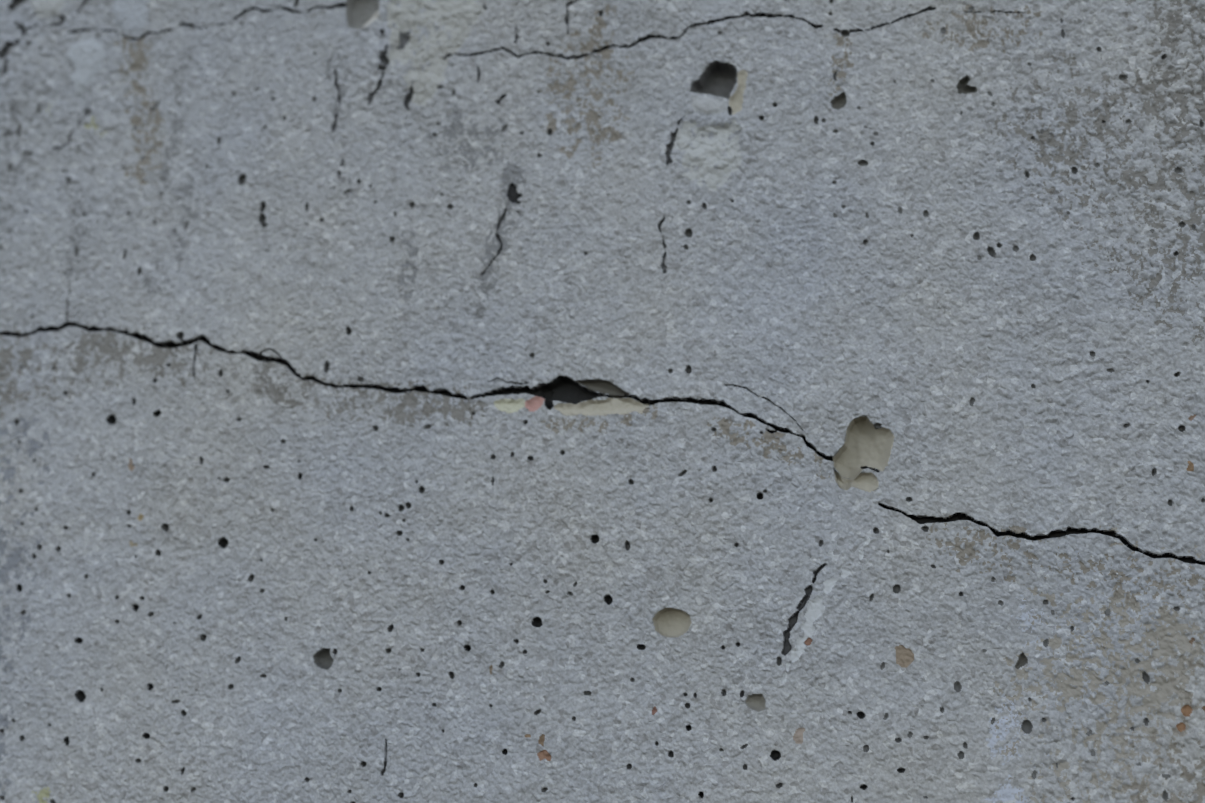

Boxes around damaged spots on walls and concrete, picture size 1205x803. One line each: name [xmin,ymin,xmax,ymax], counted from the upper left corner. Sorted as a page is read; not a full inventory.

crack [0,0,347,75]
spalling [346,0,485,106]
crack [443,1,1020,82]
spalling [672,61,748,192]
crack [0,282,833,461]
spalling [494,398,525,413]
spalling [554,378,649,416]
hole [833,416,895,492]
crack [878,503,1205,565]
hole [653,608,691,638]
crack [781,564,825,656]